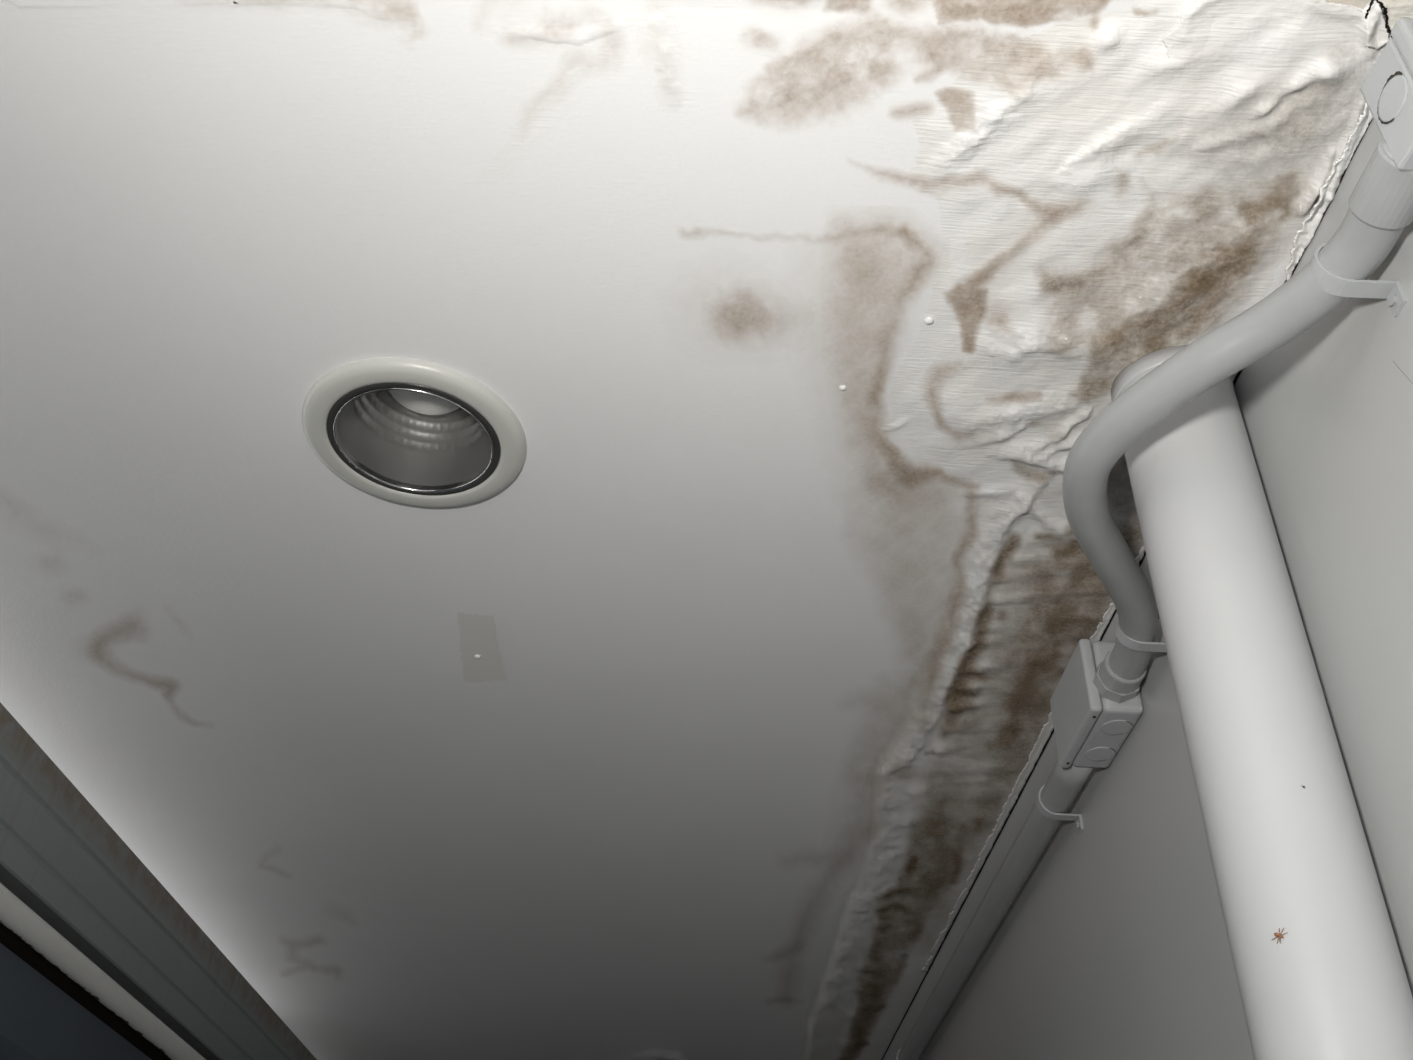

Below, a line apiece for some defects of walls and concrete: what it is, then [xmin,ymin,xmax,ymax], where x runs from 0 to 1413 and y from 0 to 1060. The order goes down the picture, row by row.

damp [947,0,1053,24]
peeling [1162,0,1413,76]
crack [1365,0,1392,38]